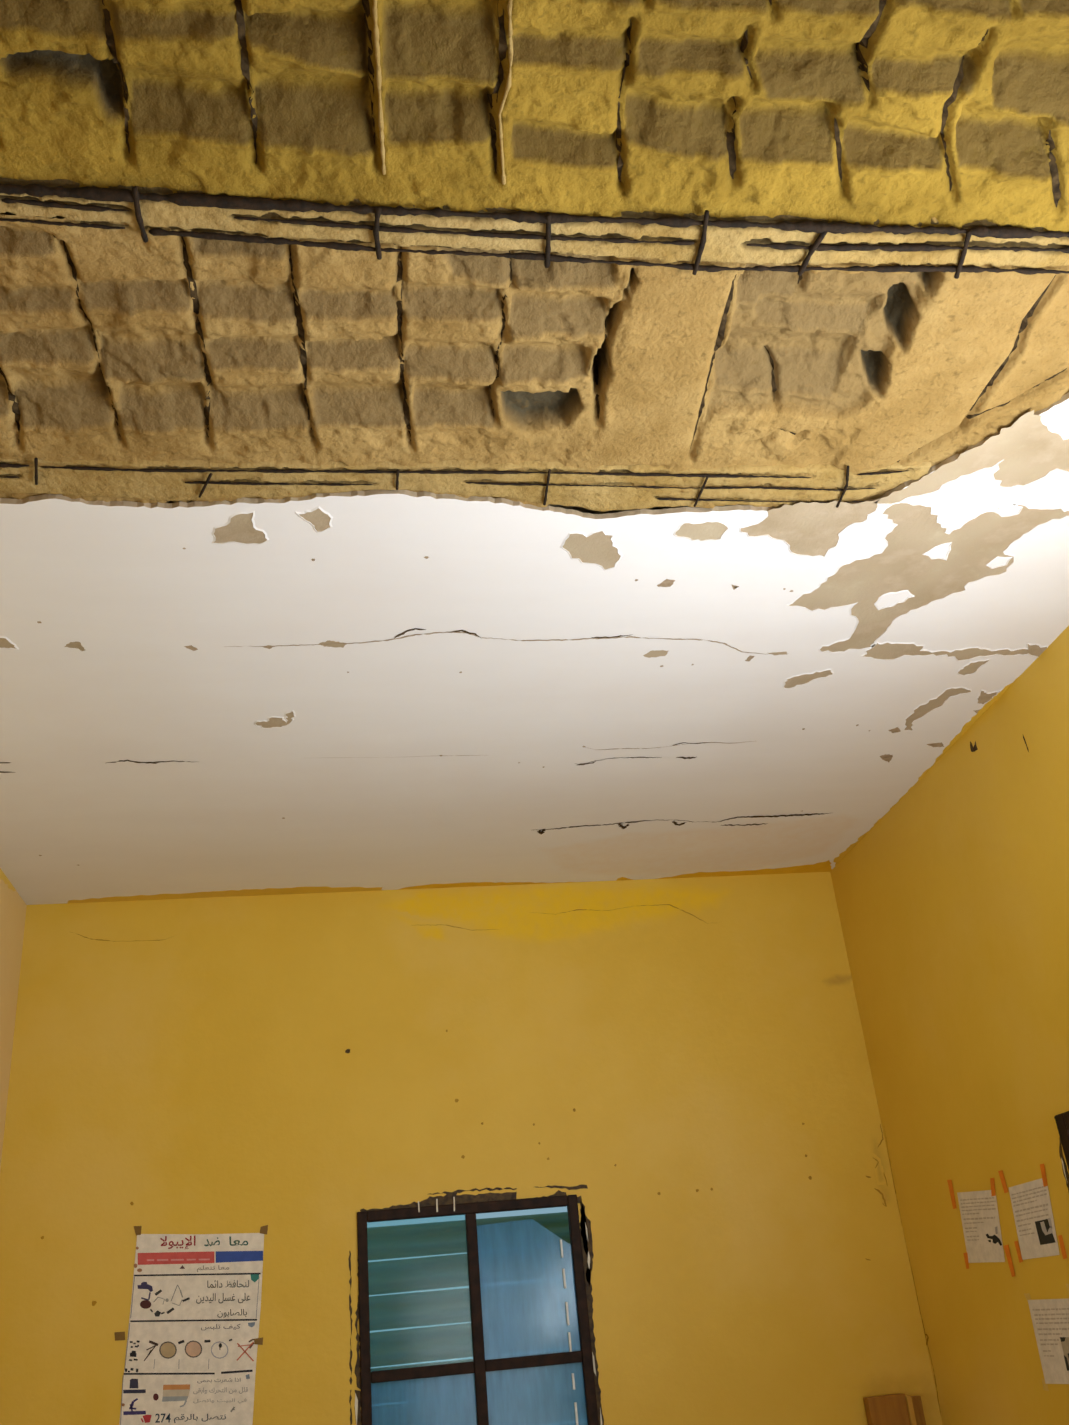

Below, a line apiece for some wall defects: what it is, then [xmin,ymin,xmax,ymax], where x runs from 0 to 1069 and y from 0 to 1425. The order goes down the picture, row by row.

spalling [0,0,1069,733]
crack [227,628,789,654]
crack [535,813,829,834]